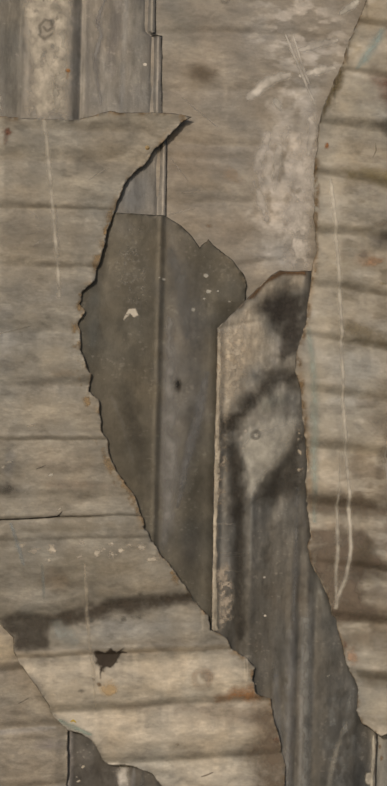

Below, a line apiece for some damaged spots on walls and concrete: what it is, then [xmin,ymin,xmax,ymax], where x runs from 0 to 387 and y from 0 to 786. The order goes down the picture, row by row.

leakage [263,290,301,357]
leakage [220,374,297,433]
peeling [212,329,244,630]
leakage [228,447,244,639]
peeling [94,648,127,673]
peeling [365,735,375,786]